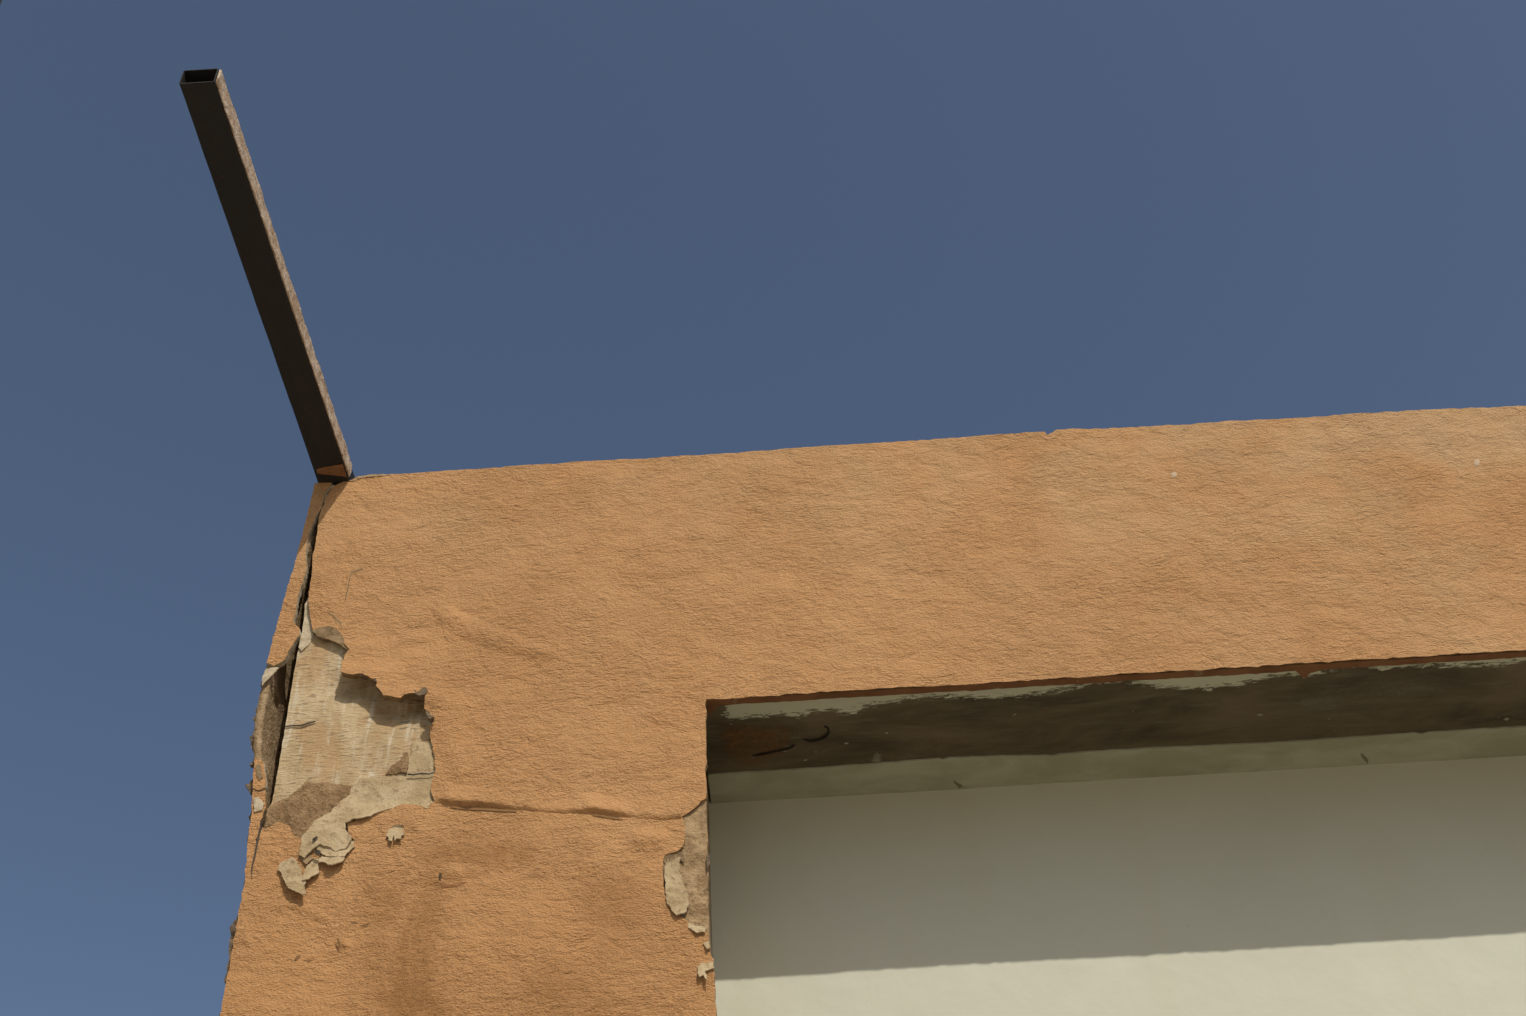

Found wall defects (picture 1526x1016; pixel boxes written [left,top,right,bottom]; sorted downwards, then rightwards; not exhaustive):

crack [327,569,361,628]
spalling [264,597,435,895]
crack [251,819,263,879]
peeling [663,800,714,981]
peeling [224,916,238,984]